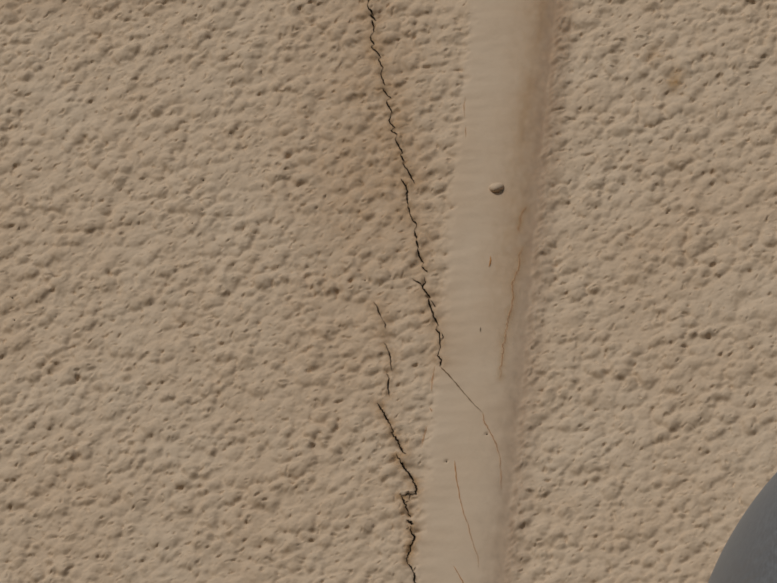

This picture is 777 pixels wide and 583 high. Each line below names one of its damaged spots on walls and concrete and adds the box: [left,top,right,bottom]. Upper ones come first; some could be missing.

crack [367,0,488,428]
crack [374,303,432,583]